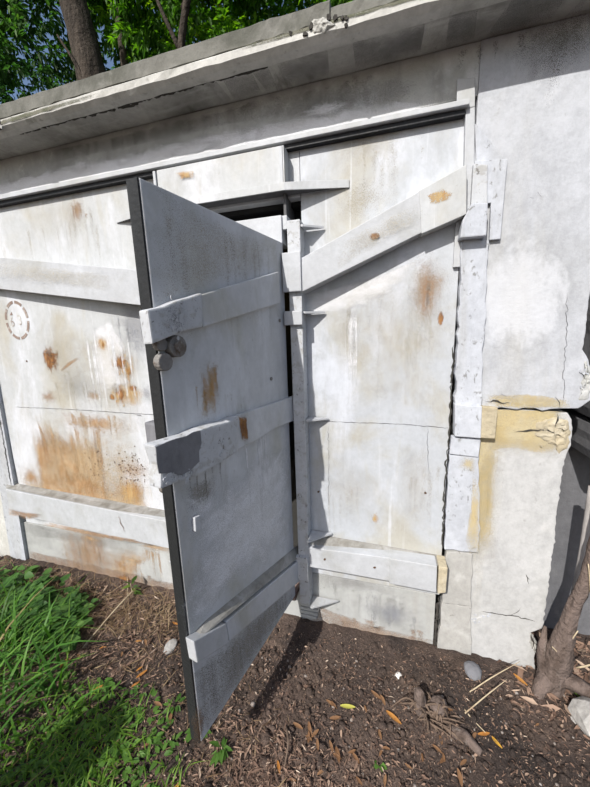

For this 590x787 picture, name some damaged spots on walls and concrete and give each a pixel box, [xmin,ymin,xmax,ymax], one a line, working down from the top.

spalling [303,14,349,37]
crack [19,67,268,135]
corrosion [428,190,452,203]
corrosion [195,363,219,415]
spalling [578,361,590,400]
corrosion [24,331,152,506]
spalling [516,414,571,454]
water stain [459,394,569,557]